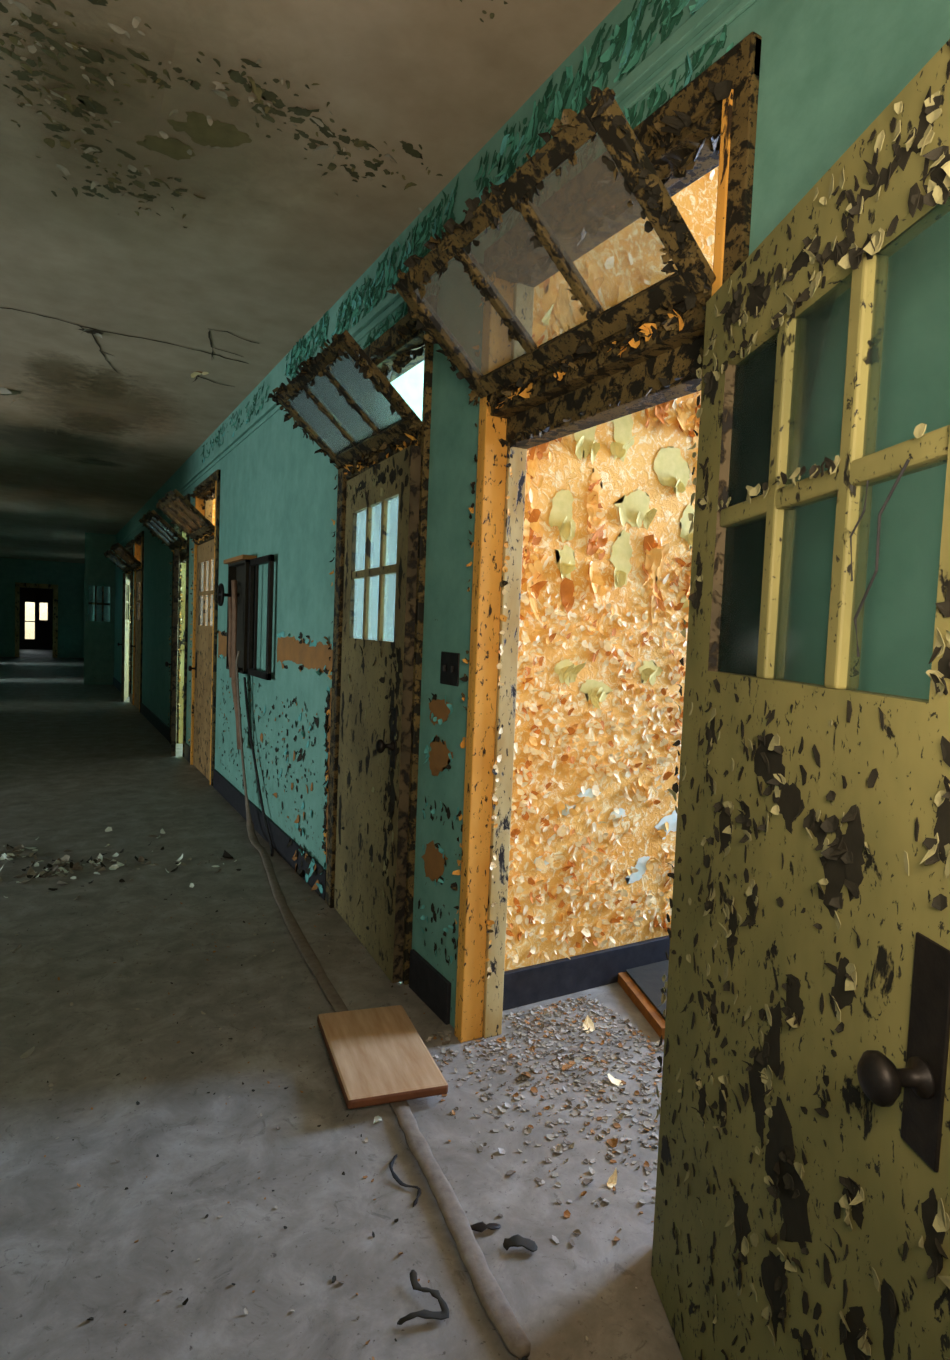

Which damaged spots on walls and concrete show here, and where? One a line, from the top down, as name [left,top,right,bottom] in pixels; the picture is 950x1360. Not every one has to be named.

peeling [0,0,443,228]
crack [0,307,259,387]
peeling [201,0,950,1360]